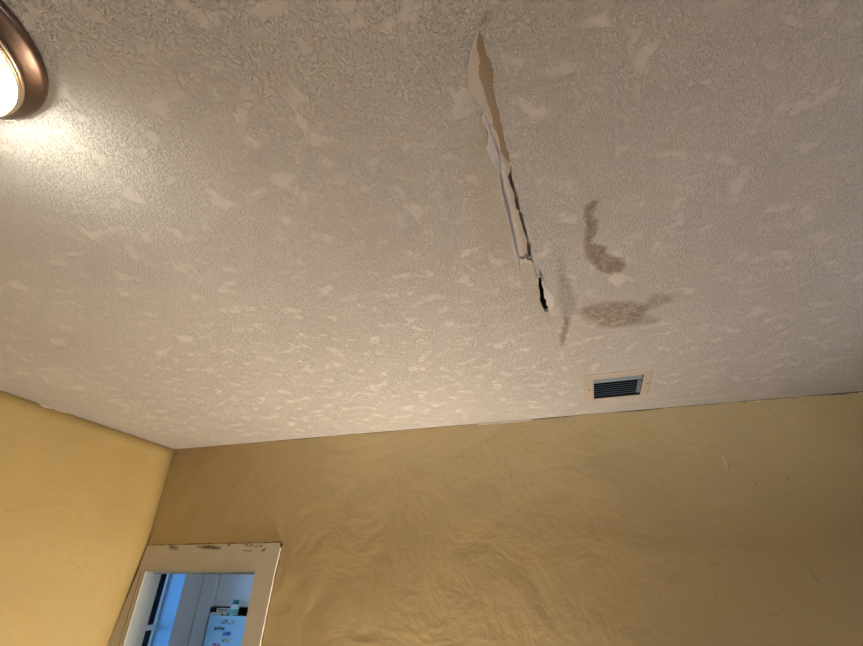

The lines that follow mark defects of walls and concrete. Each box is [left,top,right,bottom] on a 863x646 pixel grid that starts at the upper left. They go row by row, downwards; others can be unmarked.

spalling [538,277,548,309]